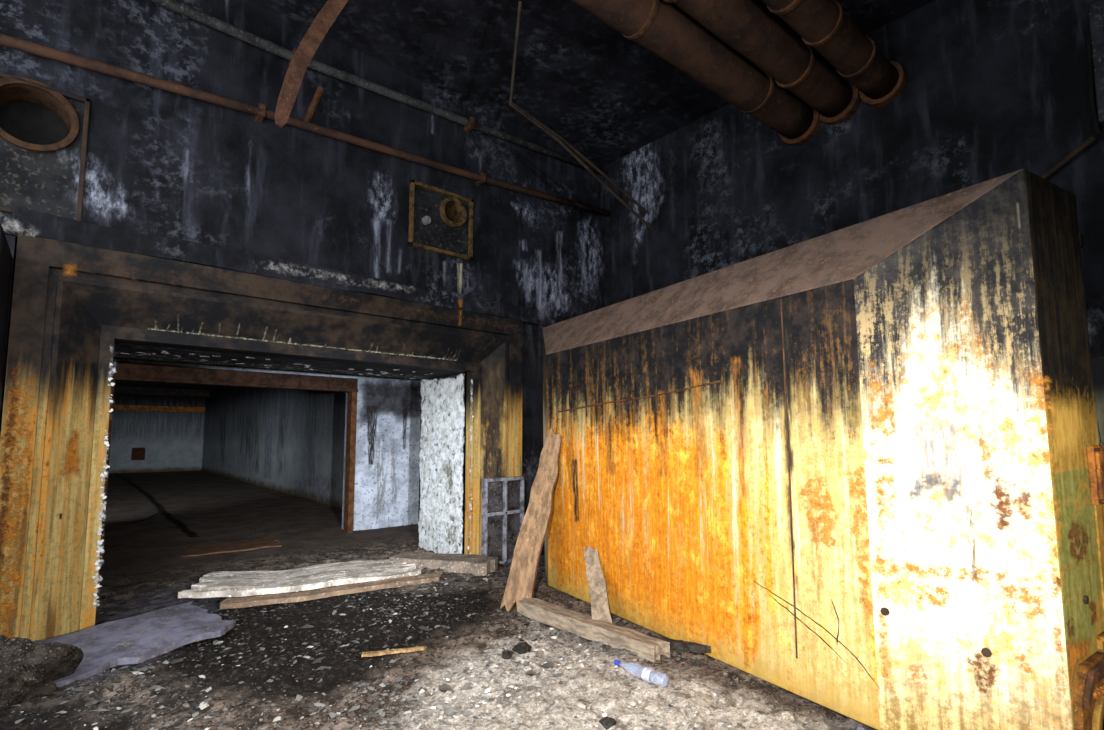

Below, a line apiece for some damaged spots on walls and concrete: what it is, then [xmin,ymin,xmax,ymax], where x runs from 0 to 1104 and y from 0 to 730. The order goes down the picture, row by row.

water stain [626,144,661,239]
water stain [518,233,567,314]
water stain [580,220,601,288]
corrosion [0,368,32,639]
water stain [367,400,407,518]
corrosion [800,477,837,548]
corrosion [870,381,895,435]
corrosion [979,438,1032,530]
corrosion [1029,376,1081,464]
corrosion [849,459,1067,685]
corrosion [968,654,997,693]
corrosion [1054,618,1090,706]